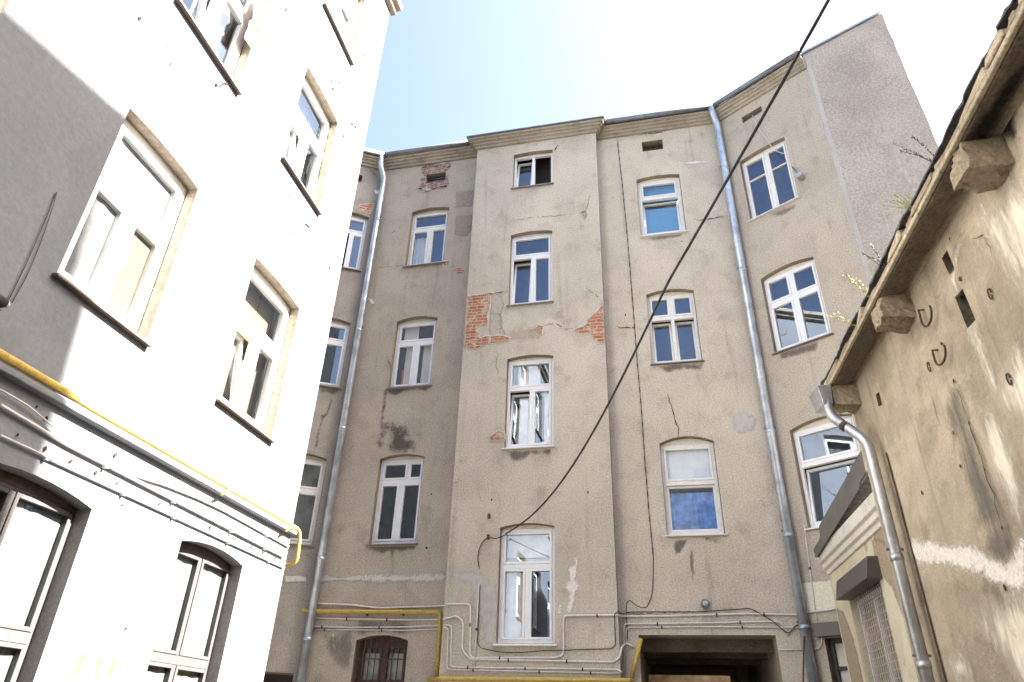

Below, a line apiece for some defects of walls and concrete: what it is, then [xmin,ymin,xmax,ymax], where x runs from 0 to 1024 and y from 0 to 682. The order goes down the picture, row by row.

flaking render [419,162,450,192]
flaking render [463,291,511,351]
flaking render [573,301,605,345]
leakage [379,389,412,453]
flaking render [488,430,506,443]
peeling [558,559,579,614]